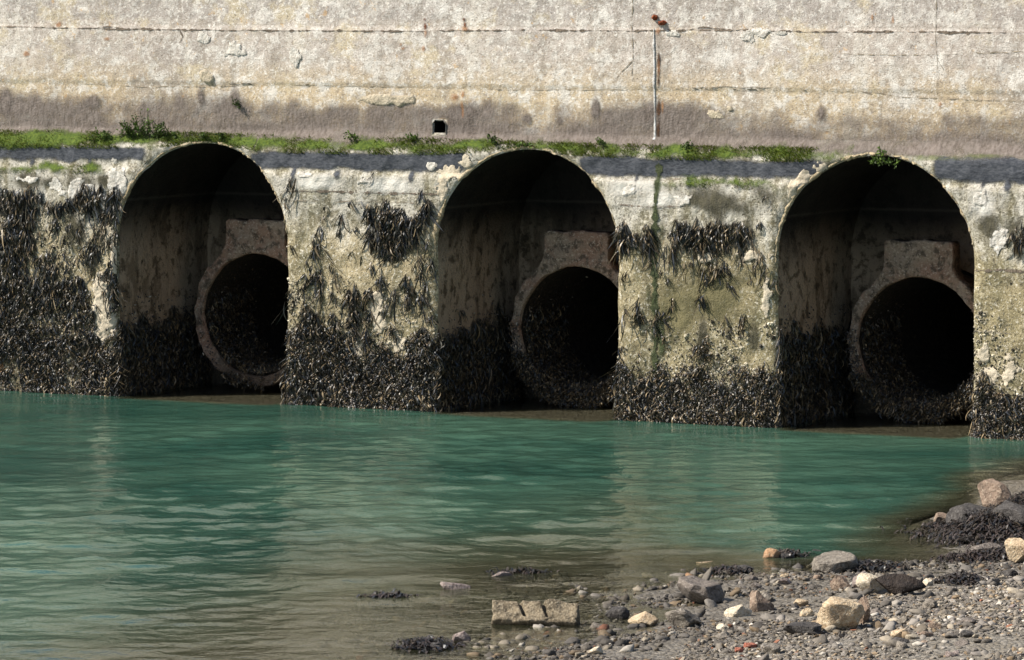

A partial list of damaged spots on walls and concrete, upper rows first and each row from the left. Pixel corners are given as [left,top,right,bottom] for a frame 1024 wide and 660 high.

damp [0,89,1024,281]
peeling [971,188,993,216]
peeling [989,228,1008,256]